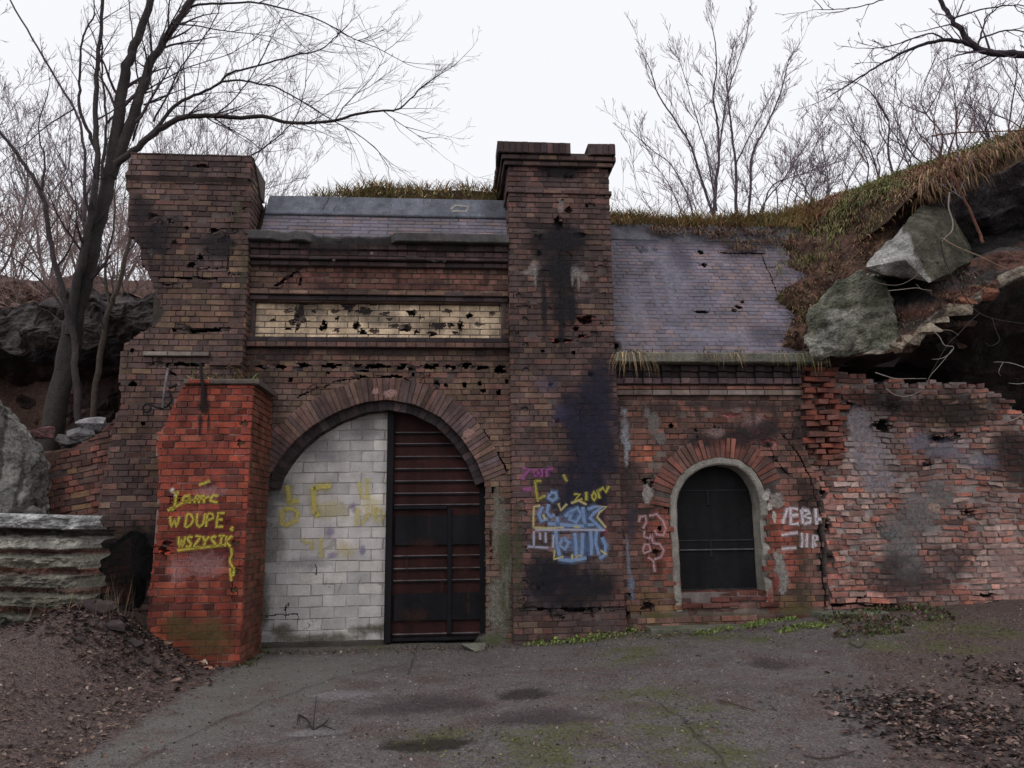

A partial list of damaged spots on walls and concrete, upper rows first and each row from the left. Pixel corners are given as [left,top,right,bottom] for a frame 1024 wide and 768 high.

spalling [353,311,431,336]
spalling [442,309,495,336]
damp [583,479,605,575]
crack [763,424,836,607]